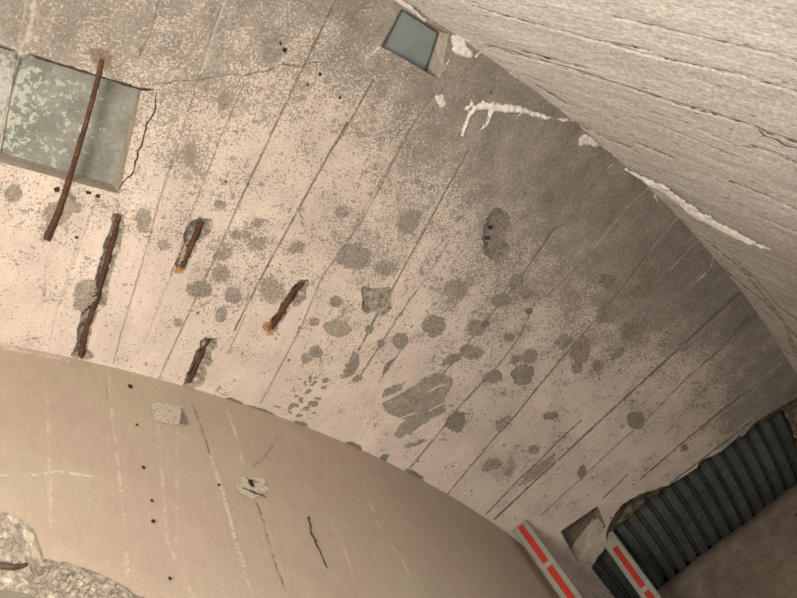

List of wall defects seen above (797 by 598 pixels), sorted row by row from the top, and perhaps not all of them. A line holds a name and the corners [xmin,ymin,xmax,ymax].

crack [119,61,319,189]
efflorescence [461,100,573,137]
peeling [135,208,151,233]
efflorescence [624,168,771,251]
spalling [71,214,125,360]
peeling [626,411,645,430]
spalling [750,398,797,447]
spalling [603,487,663,532]
spalling [0,511,145,598]
crack [308,516,328,568]